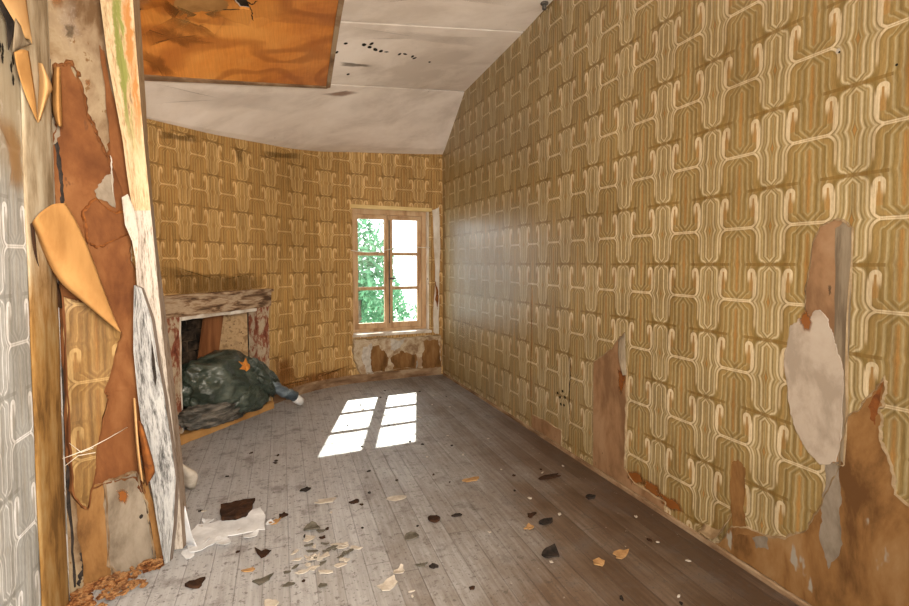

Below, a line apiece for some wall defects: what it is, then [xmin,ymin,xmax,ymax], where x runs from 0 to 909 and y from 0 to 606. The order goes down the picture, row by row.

peeling [122,194,139,270]
spalling [352,207,443,374]
peeling [592,332,667,512]
peeling [697,218,909,606]
spalling [76,468,163,586]